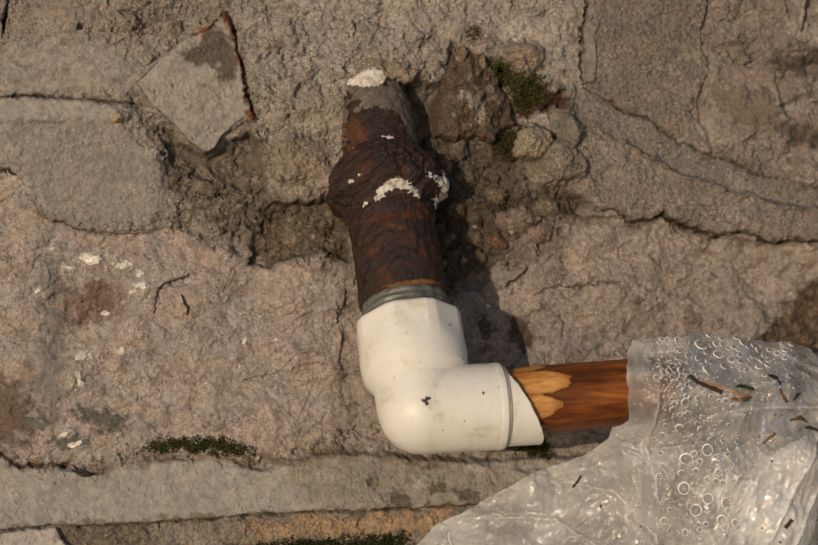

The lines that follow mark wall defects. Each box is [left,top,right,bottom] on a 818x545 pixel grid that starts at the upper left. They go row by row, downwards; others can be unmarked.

crack [578,5,622,112]
spalling [435,211,504,288]
crack [614,210,816,243]